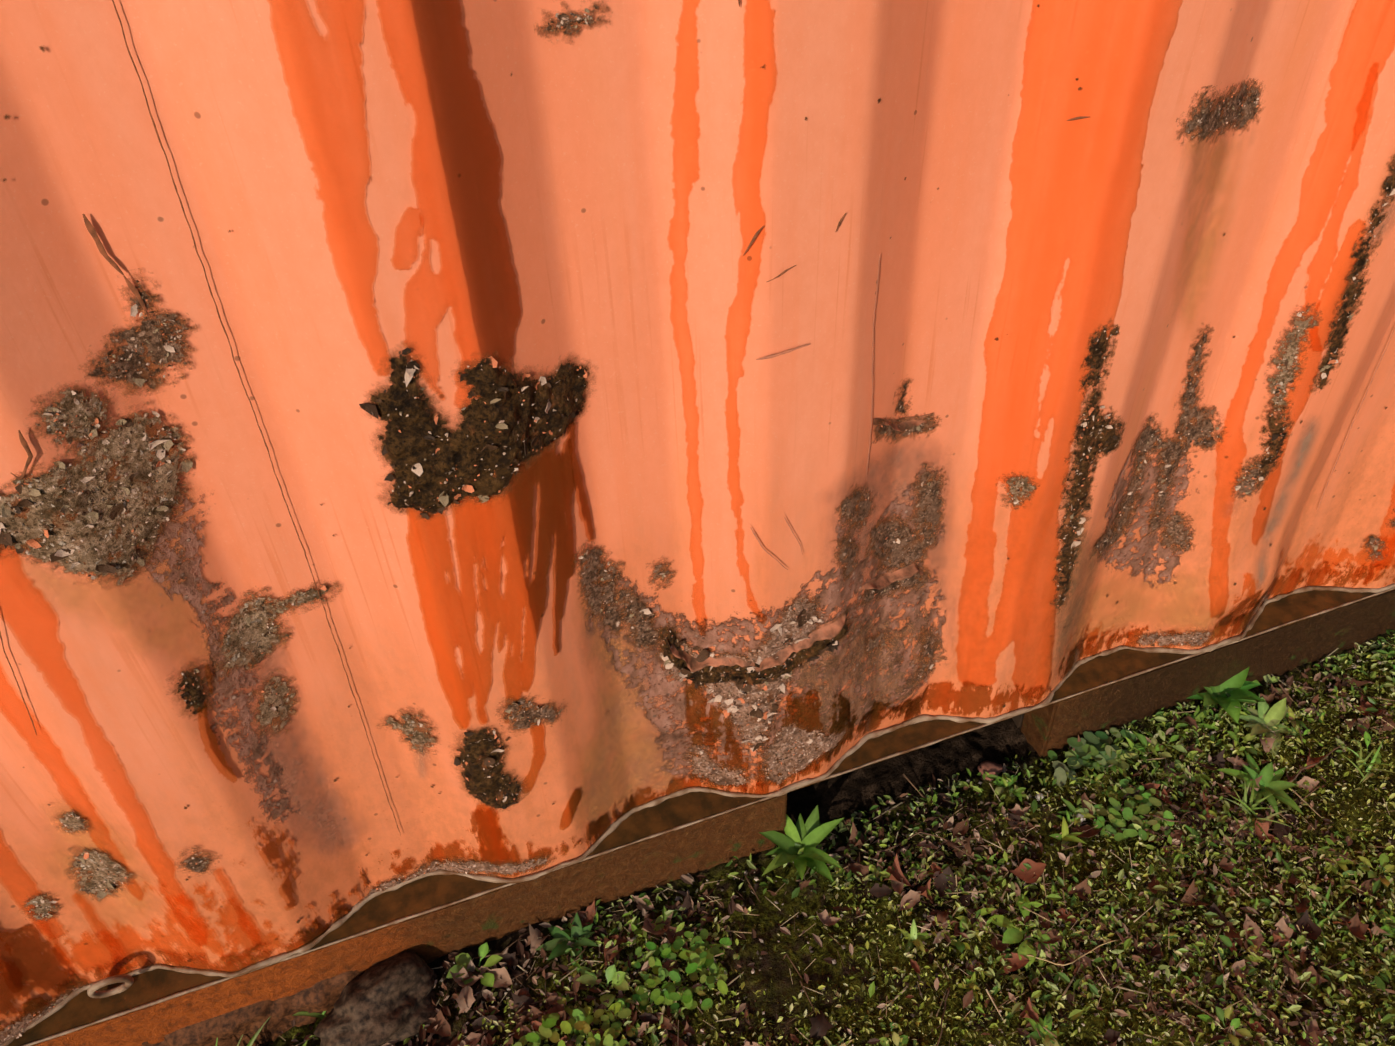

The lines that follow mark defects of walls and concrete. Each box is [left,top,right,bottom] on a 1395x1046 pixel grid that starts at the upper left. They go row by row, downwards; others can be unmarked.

corrosion [1178,79,1262,142]
peeling [404,359,418,387]
corrosion [1267,305,1322,411]
corrosion [1002,475,1037,509]
corrosion [1051,321,1225,612]
peeling [1100,441,1199,587]
peeling [143,484,300,823]
corrosion [174,583,341,736]
peeling [585,463,947,792]
corrosion [385,710,437,754]
corrosion [497,696,563,731]
corrosion [55,811,134,901]